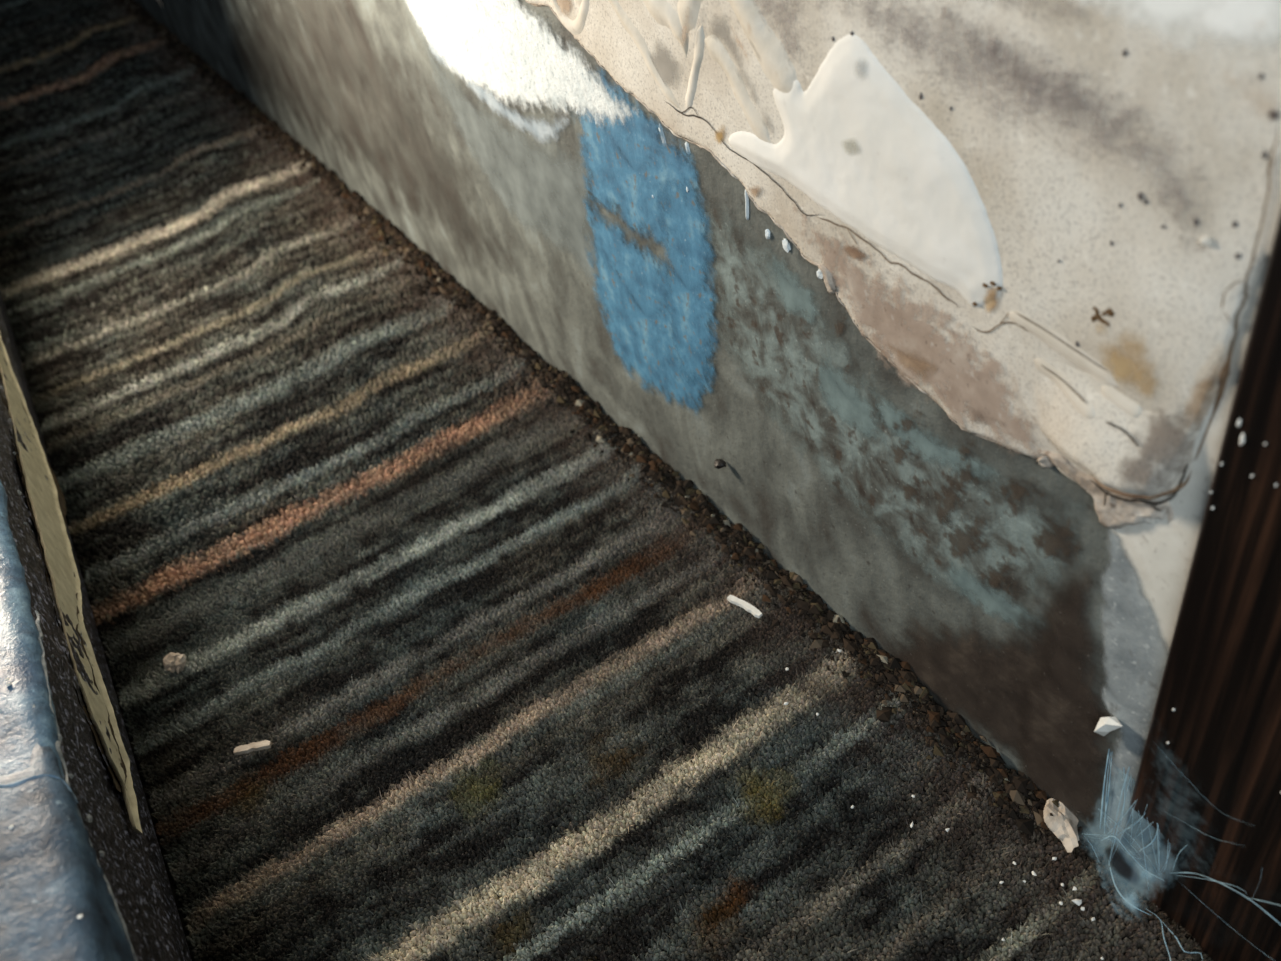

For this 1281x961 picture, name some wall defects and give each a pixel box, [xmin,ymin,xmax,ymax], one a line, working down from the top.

damp [866,4,1165,161]
damp [406,0,717,412]
damp [745,188,758,220]
spalling [525,0,1174,629]
damp [809,233,1040,456]
damp [1138,177,1186,213]
damp [892,576,1106,821]